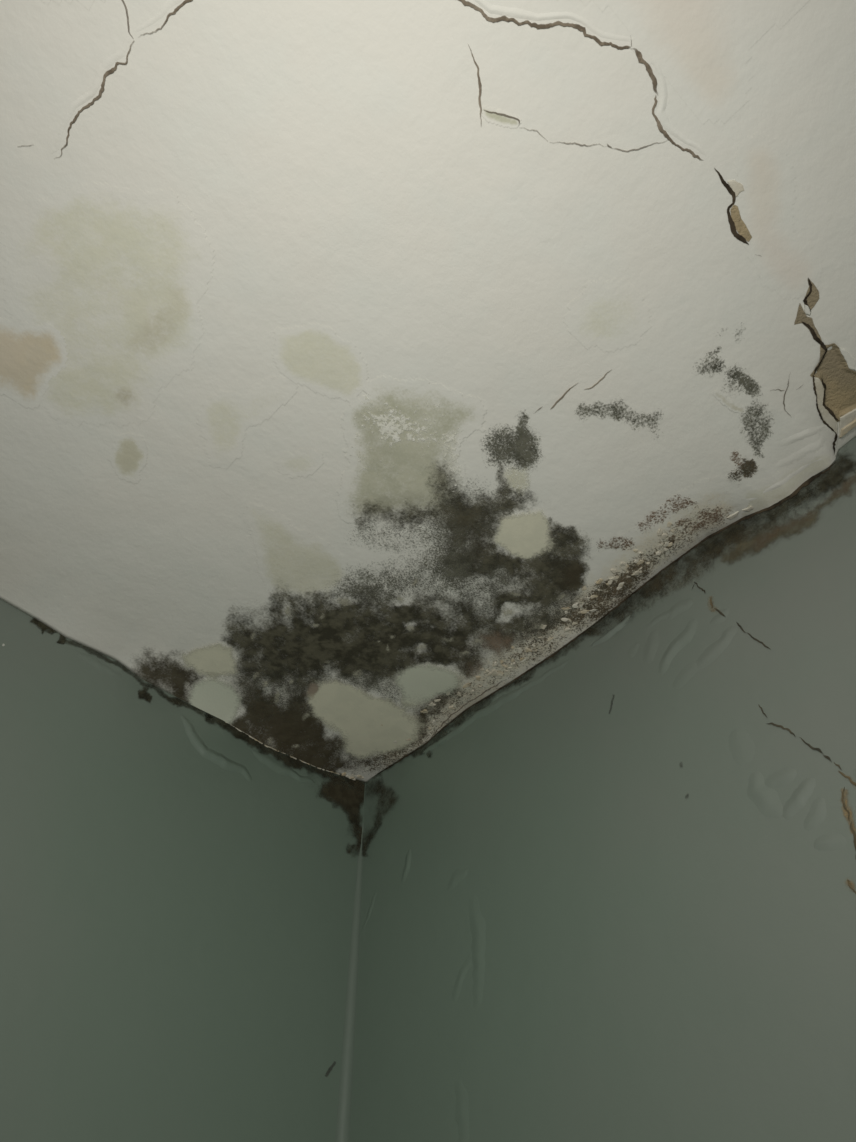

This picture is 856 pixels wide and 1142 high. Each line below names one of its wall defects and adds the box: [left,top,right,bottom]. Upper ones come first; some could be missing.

crack [22,0,192,155]
crack [459,0,752,244]
water stain [0,181,216,484]
spalling [726,278,856,519]
water stain [31,323,856,856]
crack [759,705,856,850]